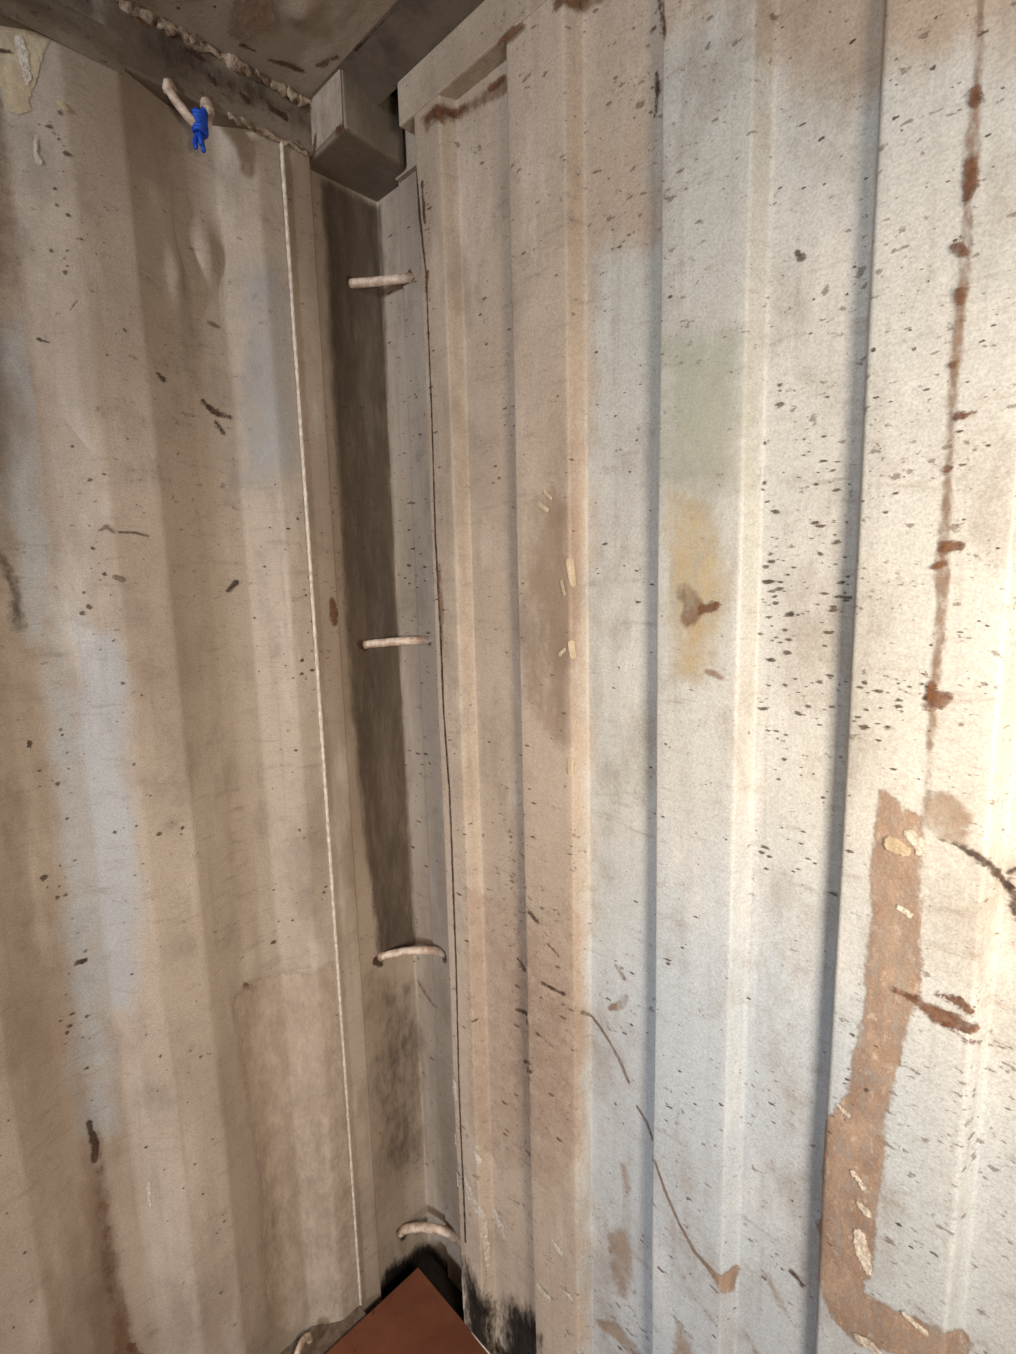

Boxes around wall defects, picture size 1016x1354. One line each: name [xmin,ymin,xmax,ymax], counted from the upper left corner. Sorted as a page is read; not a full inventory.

corrosion [480,2,523,45]
corrosion [423,74,507,126]
corrosion [925,6,1005,257]
corrosion [924,278,1009,433]
corrosion [762,383,905,514]
corrosion [758,456,990,853]
corrosion [927,793,1016,916]
peeling [789,790,971,1354]
leakage [381,1244,542,1354]